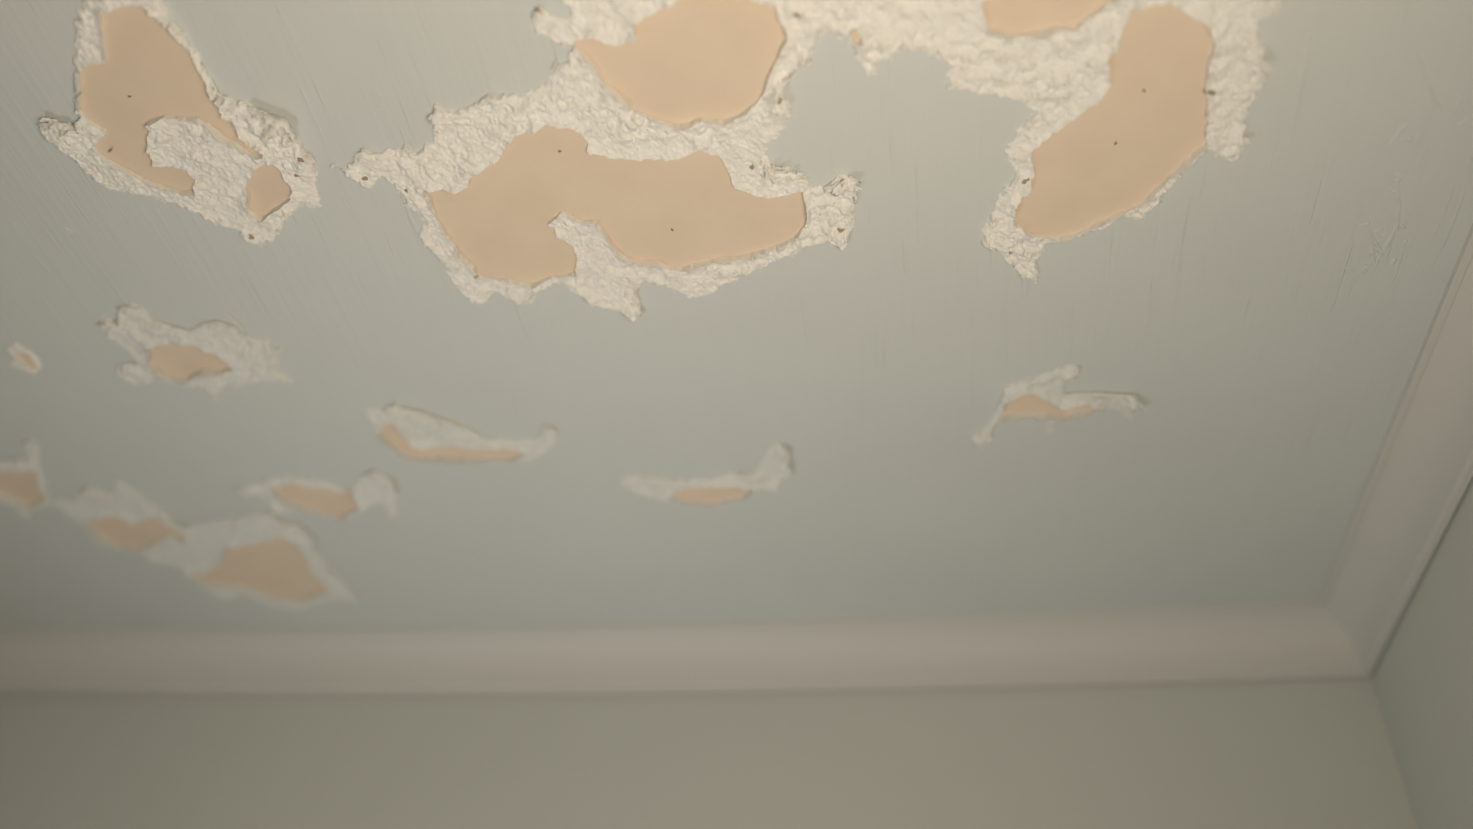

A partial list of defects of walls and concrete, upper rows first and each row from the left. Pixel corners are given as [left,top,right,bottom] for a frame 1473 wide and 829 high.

peeling [37,0,1290,323]
peeling [7,343,42,374]
peeling [94,303,293,400]
peeling [363,404,558,465]
peeling [619,440,794,507]
peeling [971,364,1147,448]
peeling [0,439,399,611]